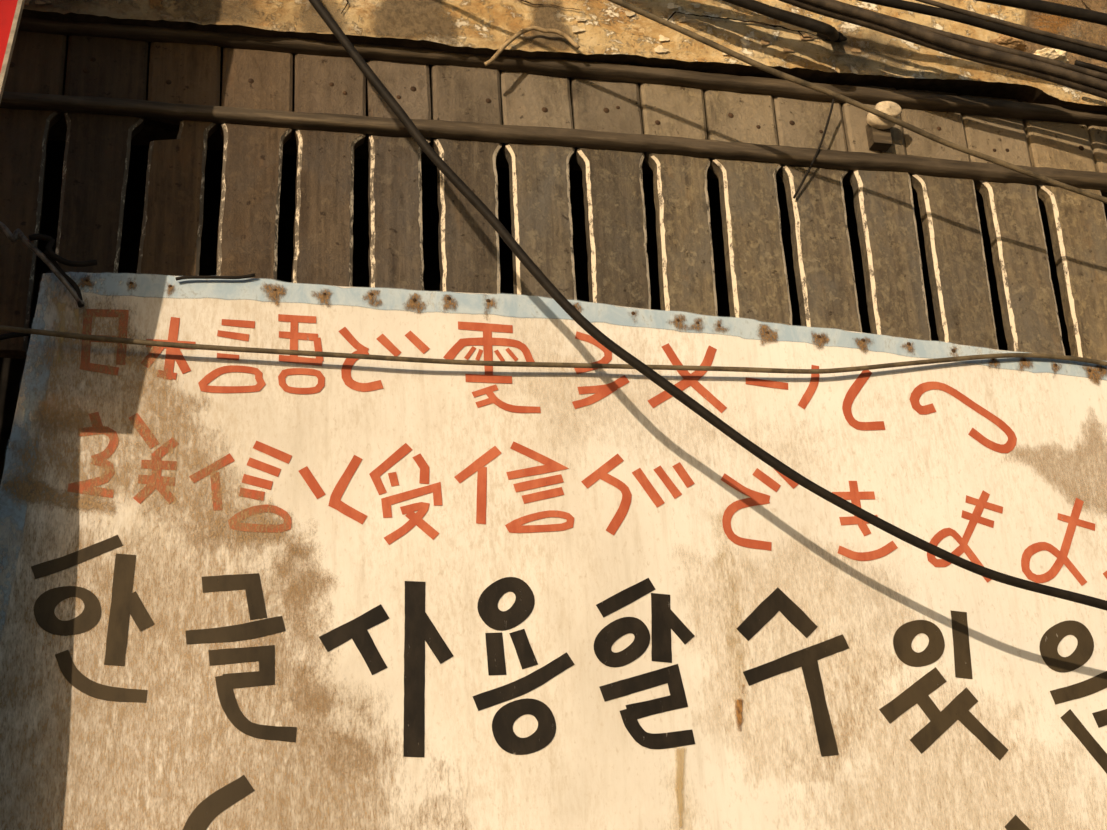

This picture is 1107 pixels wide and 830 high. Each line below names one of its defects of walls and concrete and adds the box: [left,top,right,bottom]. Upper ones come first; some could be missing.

crack [520,0,580,10]
water stain [374,0,455,43]
water stain [524,0,571,50]
spalling [1023,0,1107,46]
peeling [654,35,669,53]
spalling [1025,41,1055,54]
spalling [1066,52,1107,68]